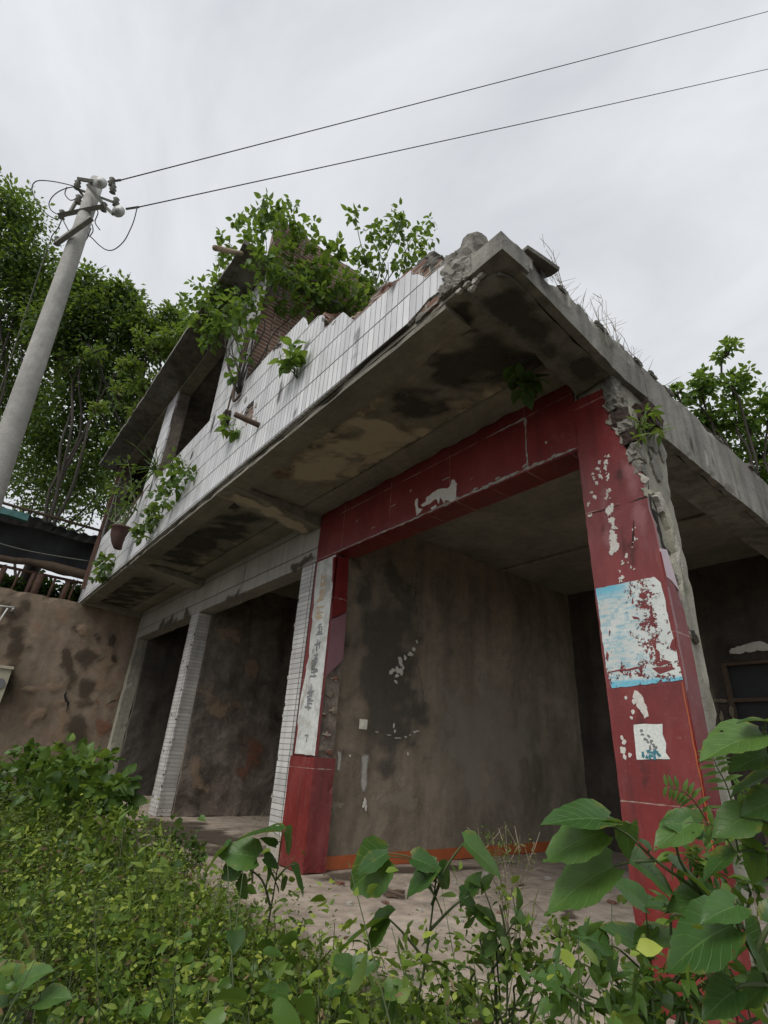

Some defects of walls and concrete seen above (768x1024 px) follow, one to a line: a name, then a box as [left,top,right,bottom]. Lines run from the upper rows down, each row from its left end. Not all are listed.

spalling [323,282,394,325]
spalling [413,231,585,324]
leakage [280,291,554,492]
spalling [601,376,667,498]
spalling [618,343,674,397]
leakage [164,493,308,572]
peeling [338,417,575,552]
peeling [587,454,638,583]
leakage [0,600,30,690]
flaking render [729,641,768,654]
leakage [59,634,116,755]
peeling [624,690,649,720]